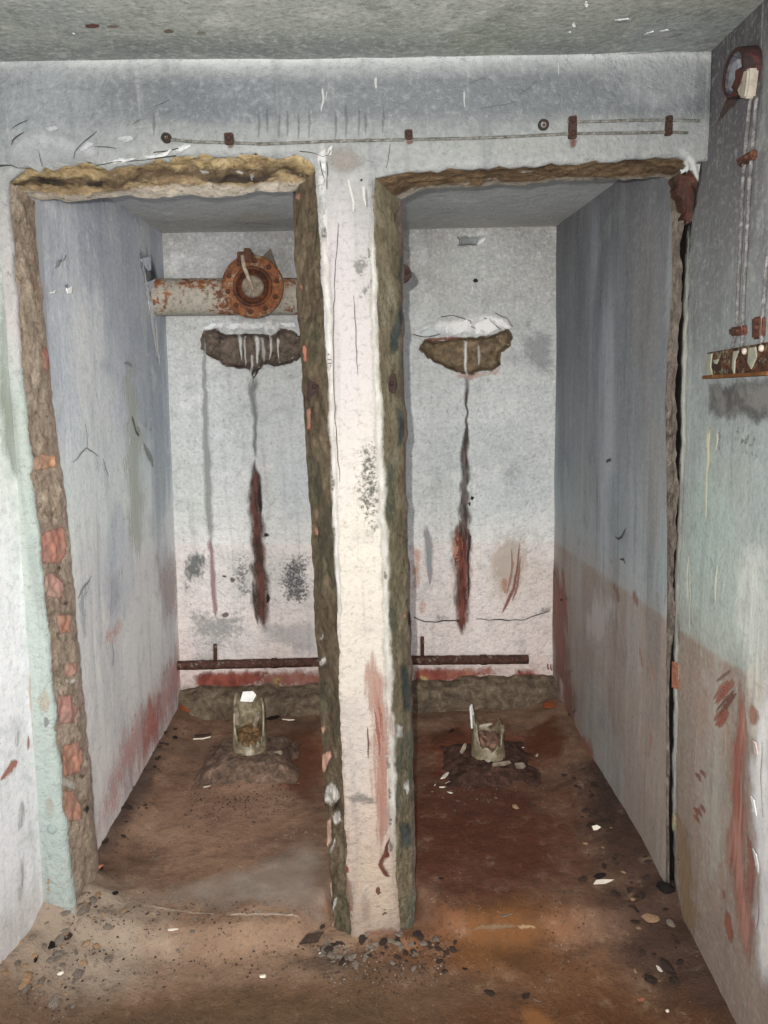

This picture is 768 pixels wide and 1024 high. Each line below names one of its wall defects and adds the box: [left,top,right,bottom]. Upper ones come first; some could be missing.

spalling [0,120,351,935]
damp [185,347,235,637]
corrosion [248,381,270,625]
damp [281,555,311,601]
corrosion [453,383,471,631]
corrosion [503,550,520,611]
spalling [368,158,690,930]
damp [709,379,768,423]
corrosion [366,656,390,877]
corrosion [713,671,758,957]